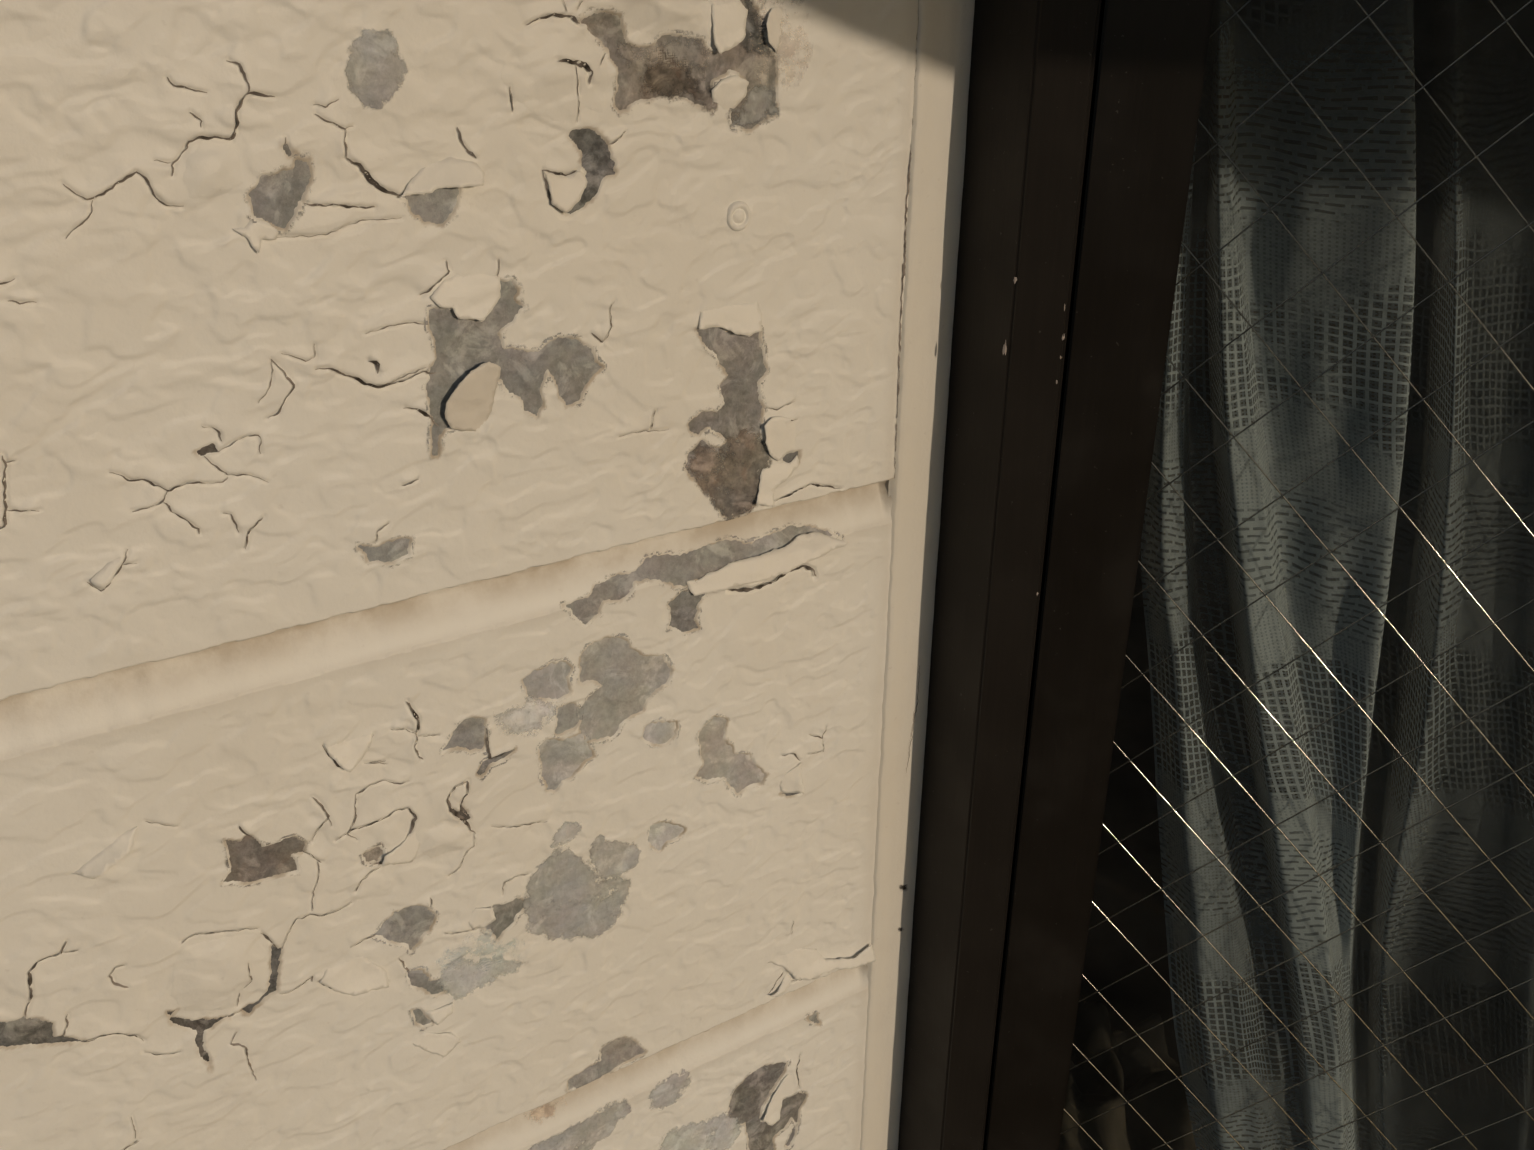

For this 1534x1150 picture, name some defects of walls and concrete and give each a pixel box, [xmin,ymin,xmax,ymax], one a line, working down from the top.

crack [63,60,275,239]
crack [277,203,402,238]
peeling [527,0,783,130]
crack [109,344,436,549]
peeling [366,260,605,456]
peeling [561,302,848,633]
crack [87,549,137,591]
peeling [167,808,420,1062]
crack [313,702,435,839]
peeling [350,634,684,1057]
crack [230,1032,257,1081]
peeling [661,1056,807,1150]